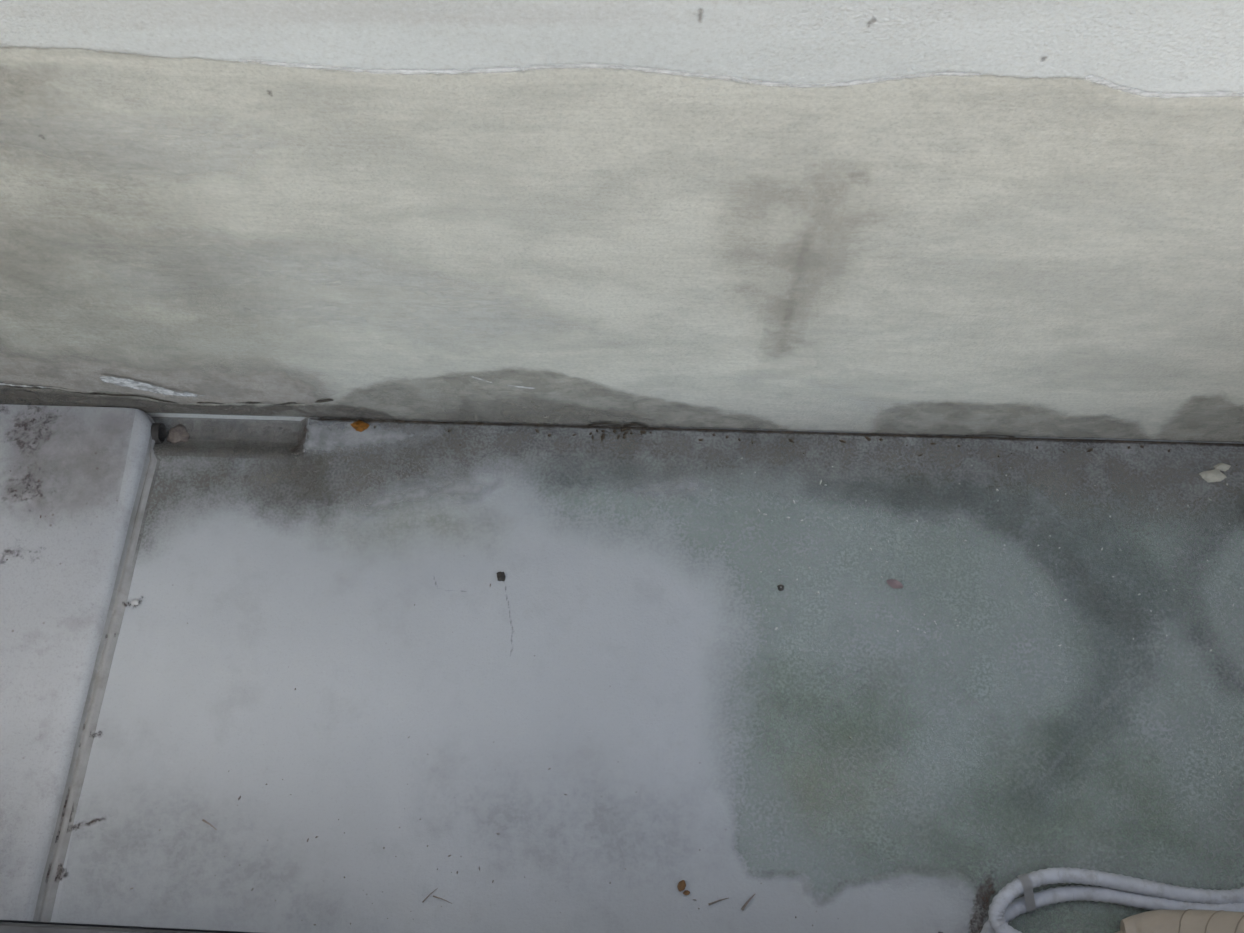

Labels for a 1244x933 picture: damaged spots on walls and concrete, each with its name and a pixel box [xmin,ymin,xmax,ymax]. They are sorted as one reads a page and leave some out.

peeling [0,352,397,420]
leakage [0,47,1244,732]